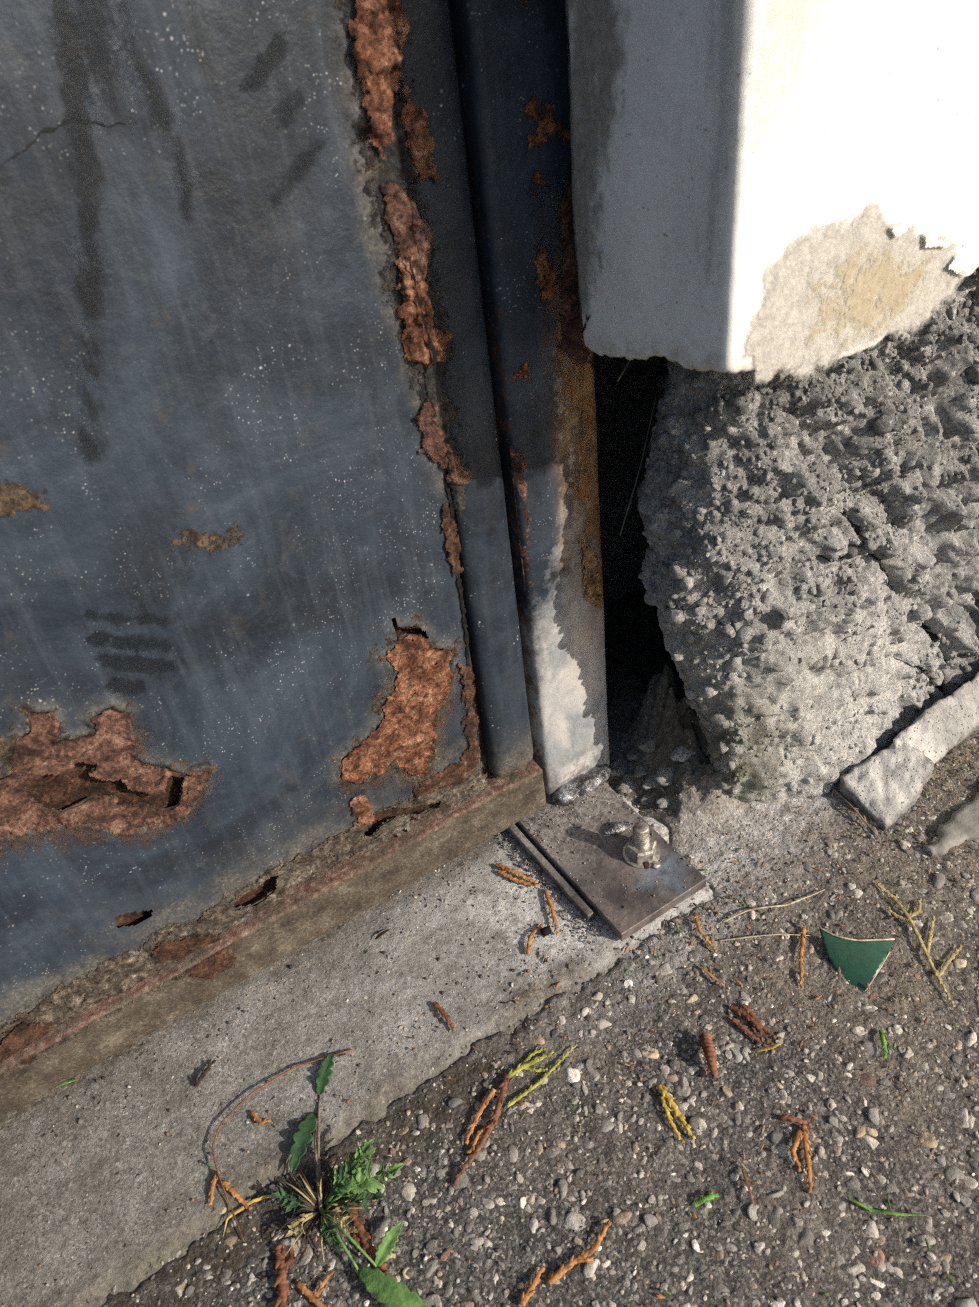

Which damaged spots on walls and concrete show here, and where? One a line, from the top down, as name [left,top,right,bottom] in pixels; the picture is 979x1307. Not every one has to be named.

rust [0,477,50,518]
rust [167,522,245,555]
rust [334,0,472,577]
rust [523,97,571,148]
rust [533,171,603,609]
spalling [637,203,979,804]
rust [0,611,488,1080]